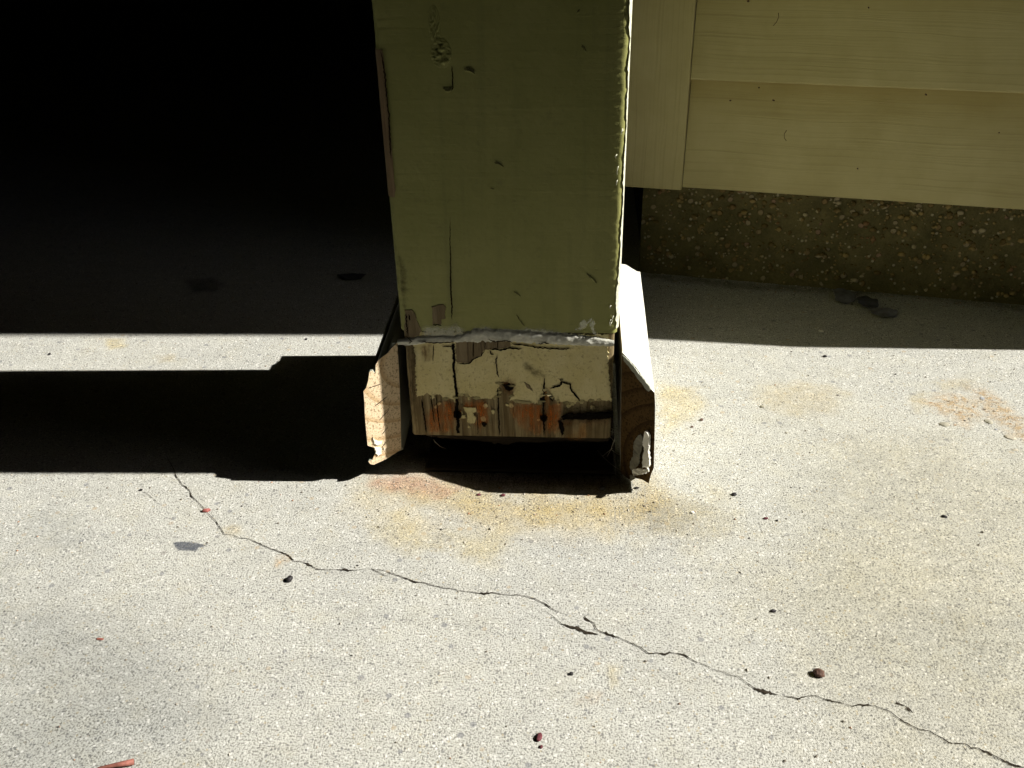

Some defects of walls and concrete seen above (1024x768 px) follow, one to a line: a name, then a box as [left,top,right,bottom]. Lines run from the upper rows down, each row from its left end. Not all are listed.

peeling [464,406,477,424]
peeling [455,340,511,364]
crack [407,238,569,435]
crack [168,460,1024,768]